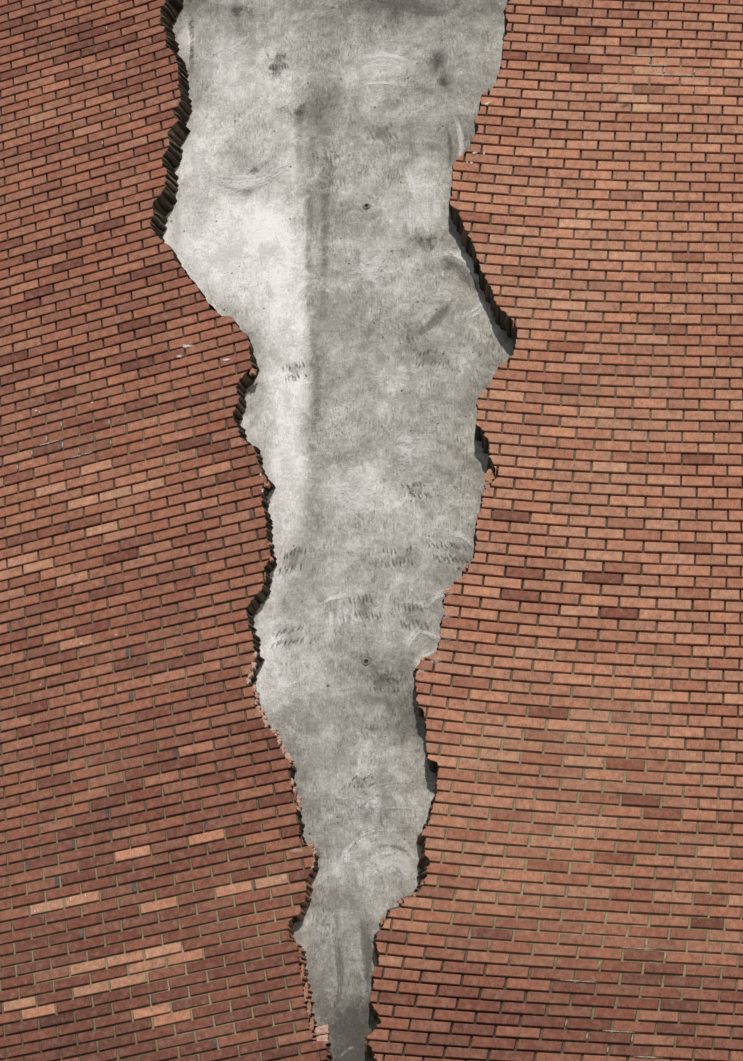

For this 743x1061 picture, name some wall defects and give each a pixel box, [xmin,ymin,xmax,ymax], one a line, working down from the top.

spalling [246,652,294,764]
spalling [298,949,329,1042]